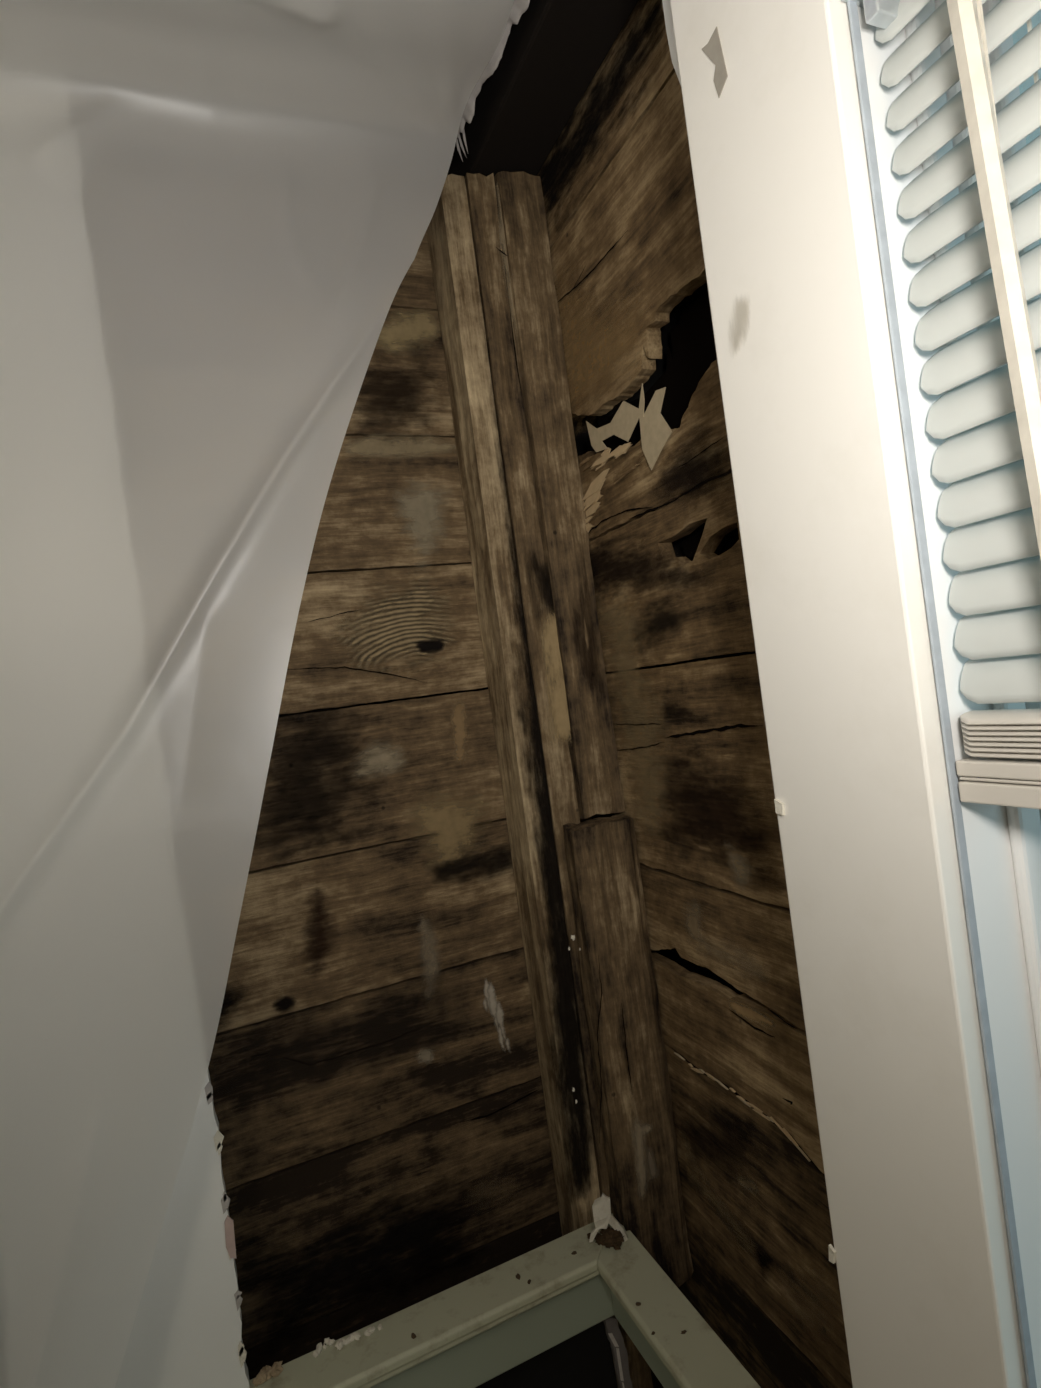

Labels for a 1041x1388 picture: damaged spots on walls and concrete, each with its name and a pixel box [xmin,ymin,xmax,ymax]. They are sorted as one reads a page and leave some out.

leakage [590,543,766,883]
crack [665,948,715,974]
crack [730,1009,796,1037]
peeling [214,1130,224,1155]
peeling [221,1190,236,1260]
peeling [589,1193,628,1243]
peeling [234,1290,243,1311]
flaking render [312,1324,383,1358]
peeling [608,1333,625,1388]